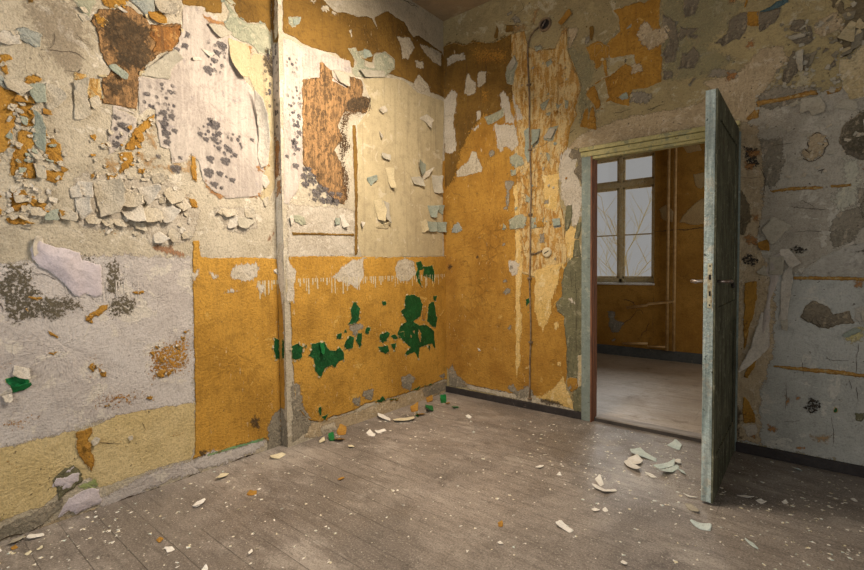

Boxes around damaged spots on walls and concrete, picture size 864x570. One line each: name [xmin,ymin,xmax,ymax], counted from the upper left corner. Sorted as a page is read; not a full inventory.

flaking render [688,0,864,445]